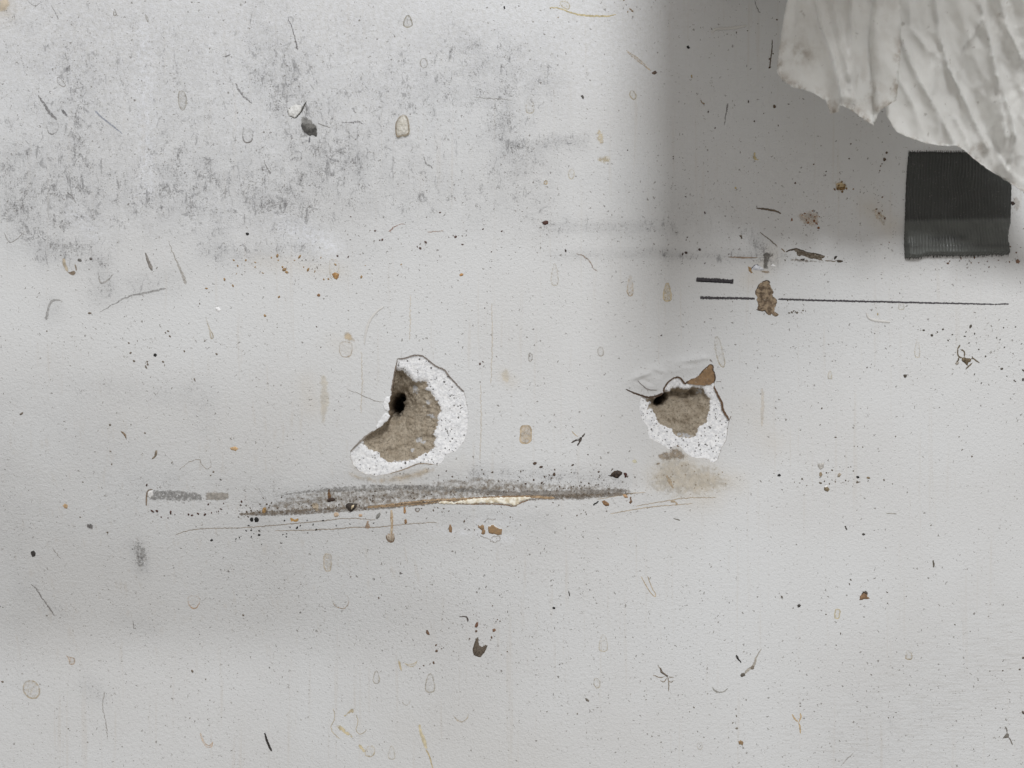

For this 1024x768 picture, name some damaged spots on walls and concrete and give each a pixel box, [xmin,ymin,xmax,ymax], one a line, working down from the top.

flaking render [349,354,469,476]
flaking render [626,360,731,463]